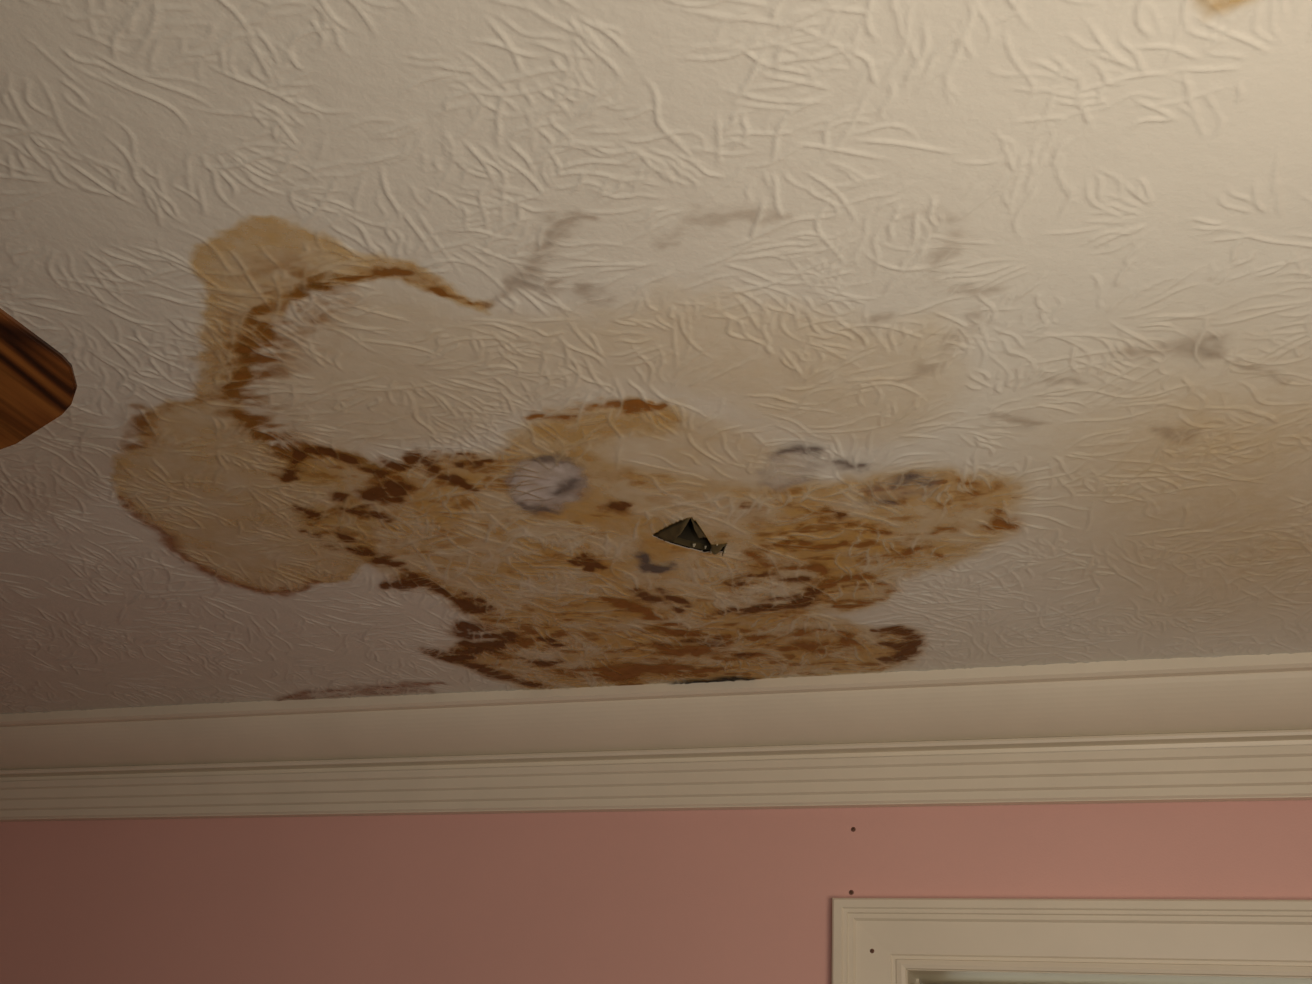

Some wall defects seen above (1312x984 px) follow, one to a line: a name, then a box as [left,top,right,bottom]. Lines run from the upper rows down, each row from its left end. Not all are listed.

damp [116,218,1019,689]
peeling [653,517,727,556]